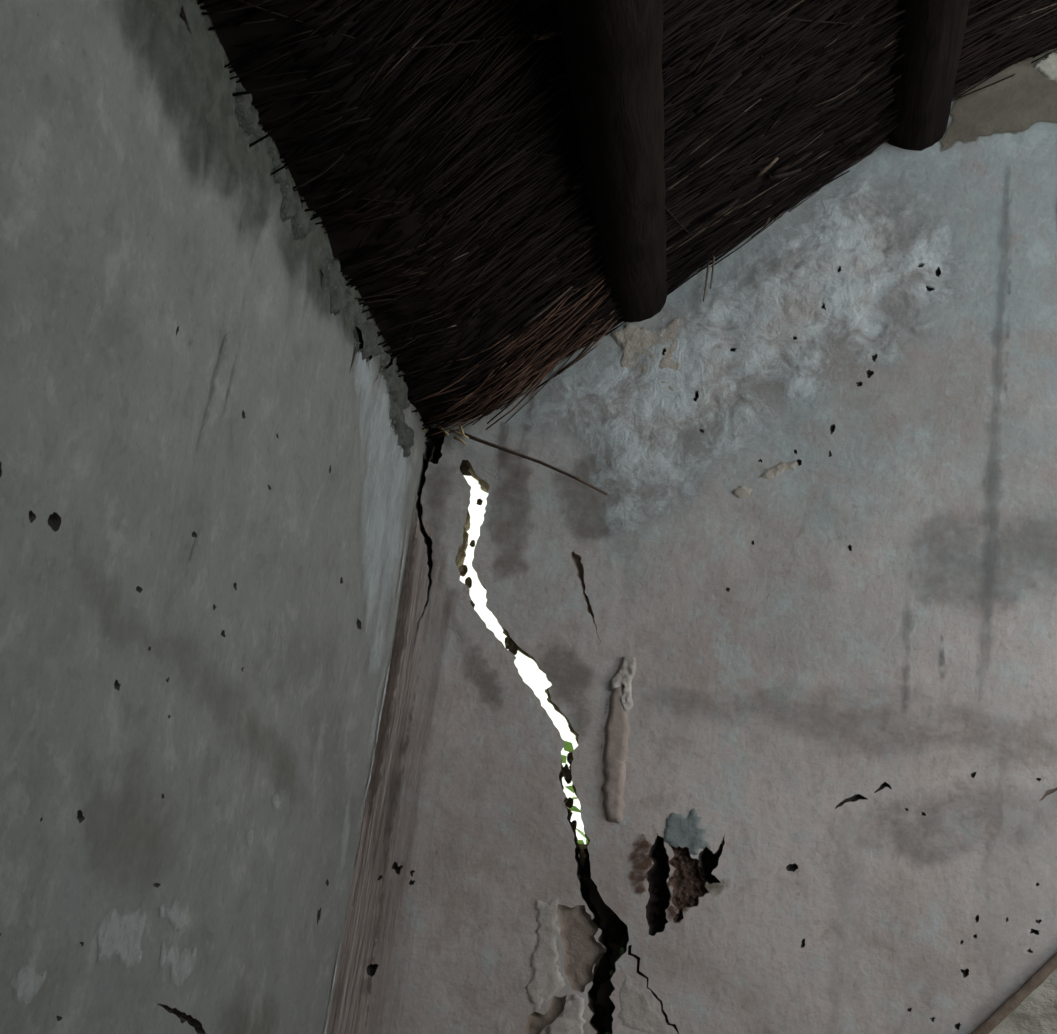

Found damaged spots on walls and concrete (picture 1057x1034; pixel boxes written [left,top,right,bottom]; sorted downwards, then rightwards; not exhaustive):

flaking render [941,48,1057,151]
crack [415,427,679,1034]
flaking render [646,808,725,936]
crack [157,1004,206,1034]
flaking render [525,899,605,1034]